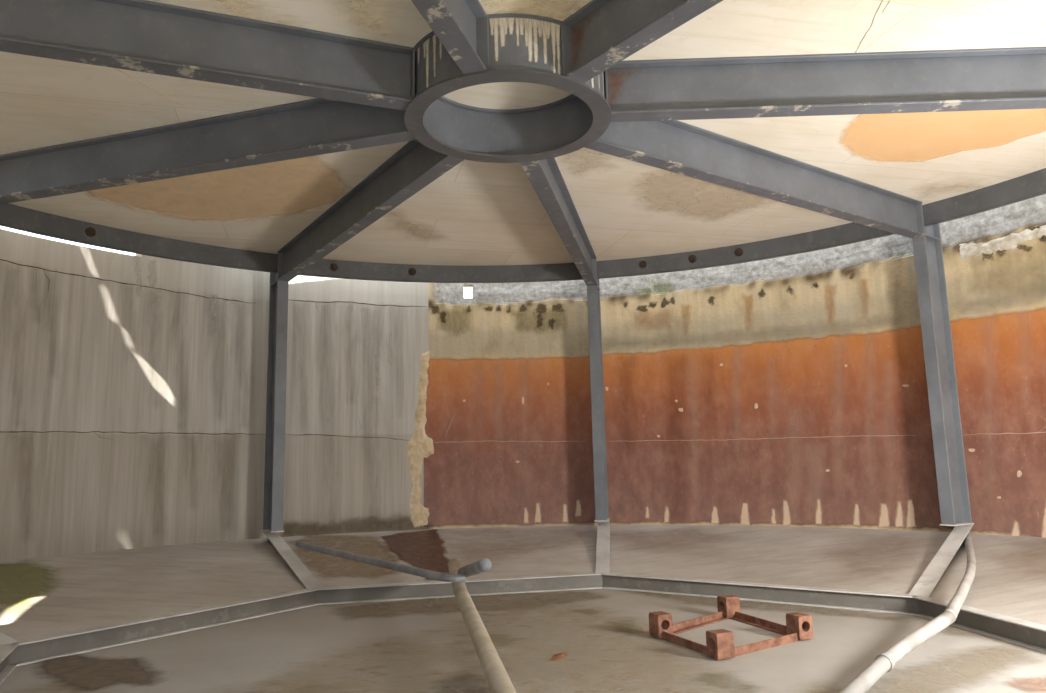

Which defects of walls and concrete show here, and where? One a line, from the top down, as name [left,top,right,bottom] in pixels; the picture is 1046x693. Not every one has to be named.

damp [489,1,560,75]
crack [855,0,890,53]
peeling [842,108,1046,162]
peeling [90,156,342,220]
damp [485,304,563,329]
damp [624,298,675,312]
crack [0,431,244,440]
spalling [407,351,434,528]
corrosion [382,325,955,580]
corrosion [950,309,1046,537]
damp [41,655,154,690]